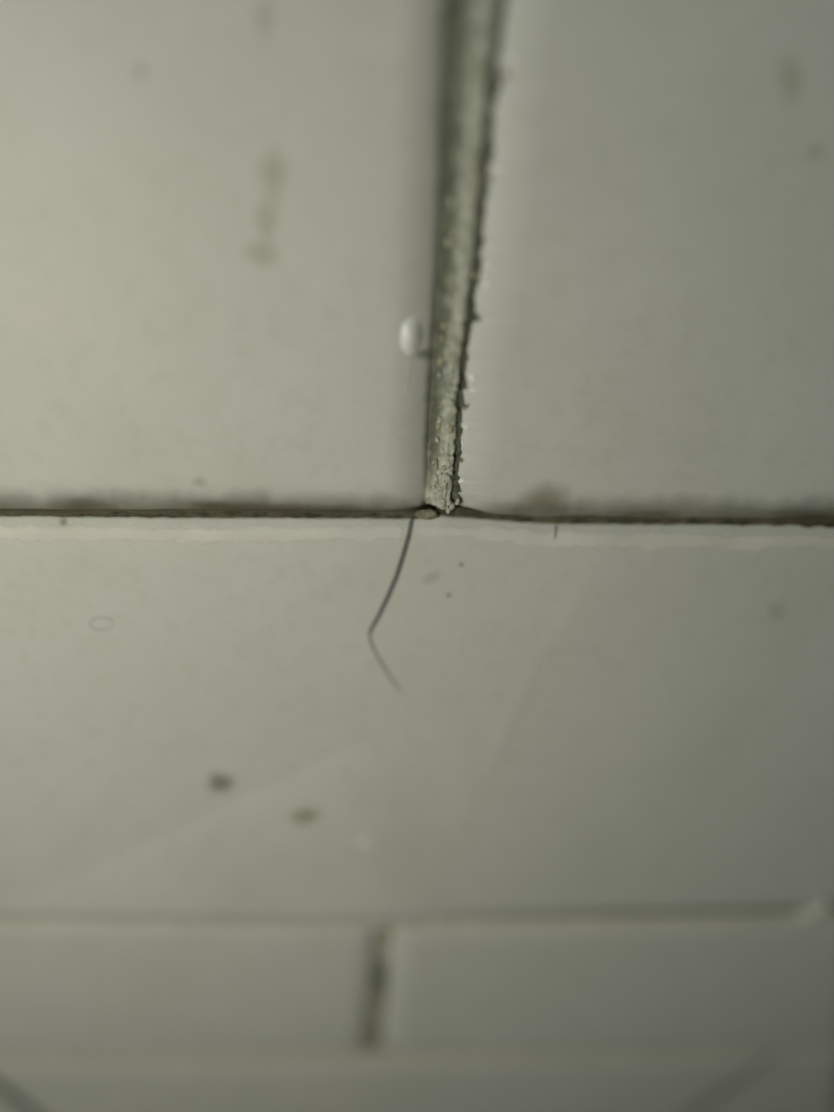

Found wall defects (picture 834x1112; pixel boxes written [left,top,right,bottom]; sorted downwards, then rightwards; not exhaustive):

crack [369,517,413,635]